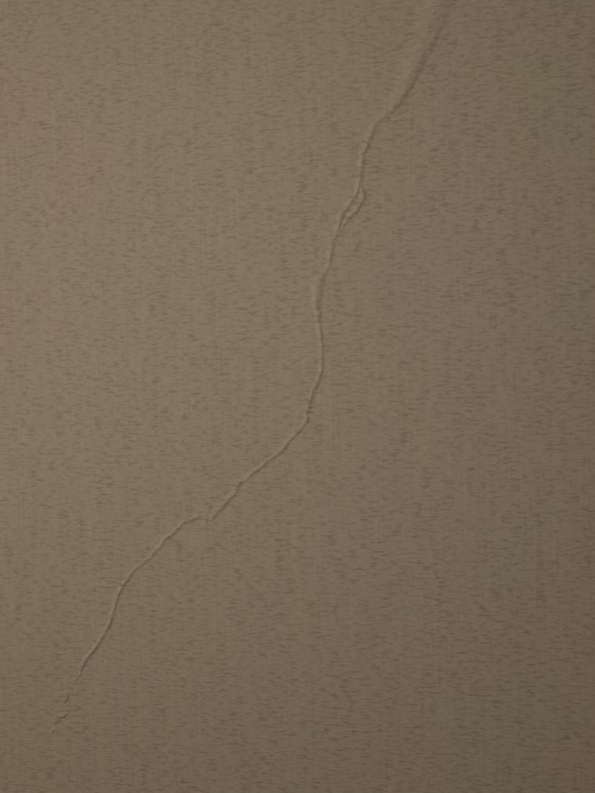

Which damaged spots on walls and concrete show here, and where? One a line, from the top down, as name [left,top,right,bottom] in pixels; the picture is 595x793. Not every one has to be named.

crack [47,87,408,735]